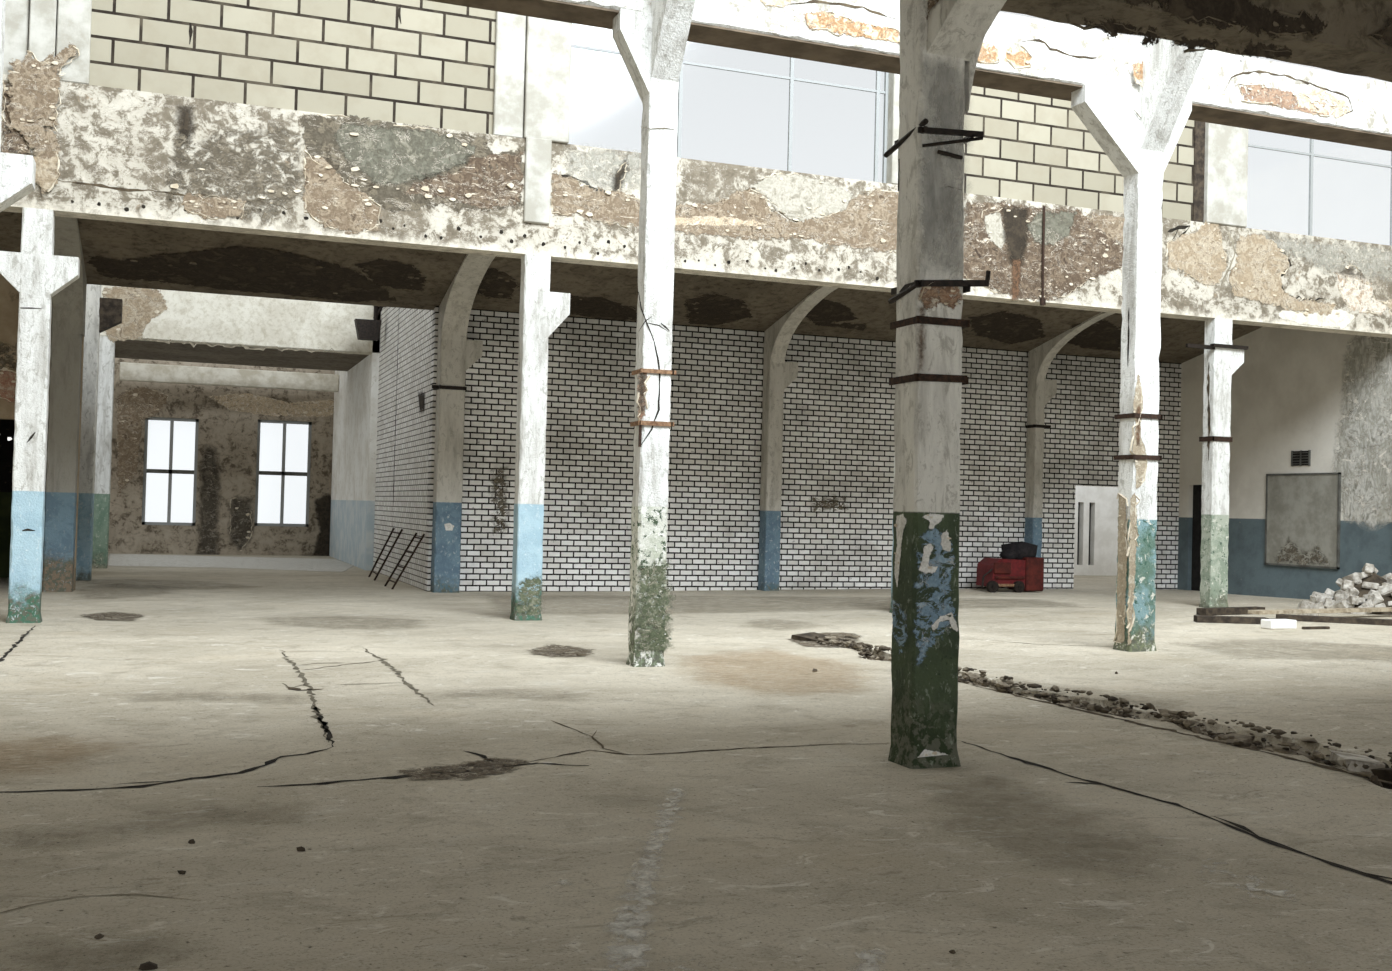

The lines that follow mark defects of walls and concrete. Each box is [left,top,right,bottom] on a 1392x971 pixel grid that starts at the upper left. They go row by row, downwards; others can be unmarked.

flaking render [1,42,80,194]
flaking render [166,114,525,235]
flaking render [1065,0,1328,87]
spalling [1237,83,1350,119]
flaking render [899,200,1125,345]
flaking render [1067,319,1122,351]
flaking render [1166,220,1392,329]
crack [0,626,35,662]
peeling [891,513,958,664]
crack [6,648,830,792]
crack [973,685,1392,784]
crack [962,741,1392,884]